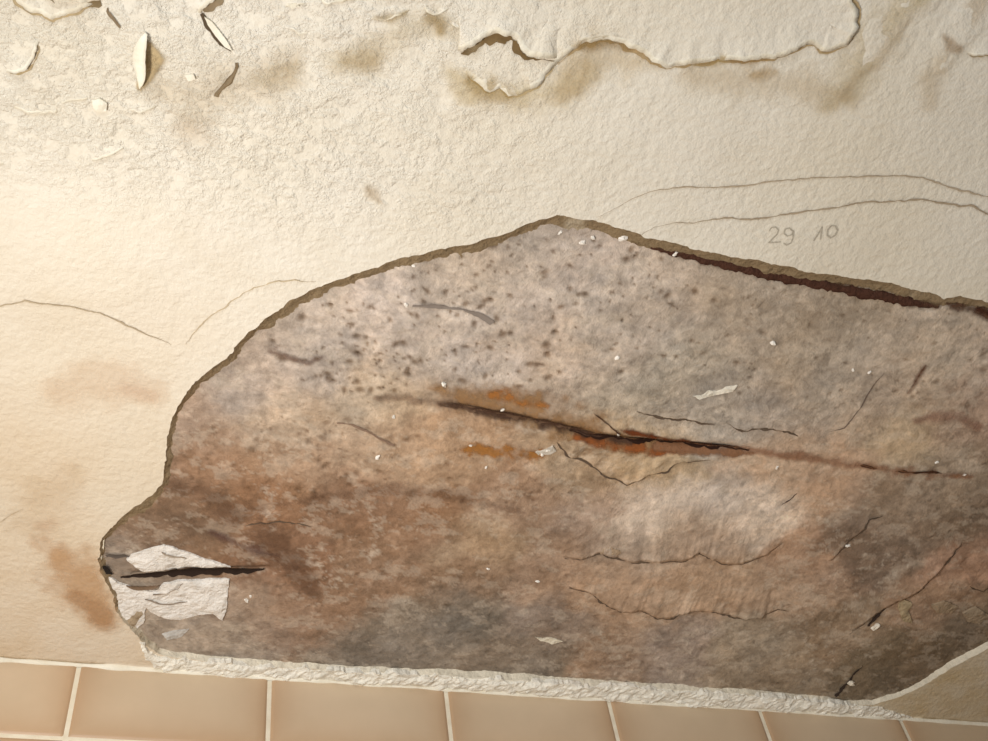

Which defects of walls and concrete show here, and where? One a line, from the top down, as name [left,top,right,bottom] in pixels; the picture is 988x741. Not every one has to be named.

peeling [13,0,102,23]
peeling [132,32,163,91]
peeling [174,0,233,51]
peeling [425,0,861,98]
crack [599,175,988,234]
crack [440,406,750,451]
rust [434,386,821,462]
spalling [97,215,988,719]
rust [854,464,913,476]
crack [860,464,942,474]
damp [51,549,112,625]
crack [102,552,264,605]